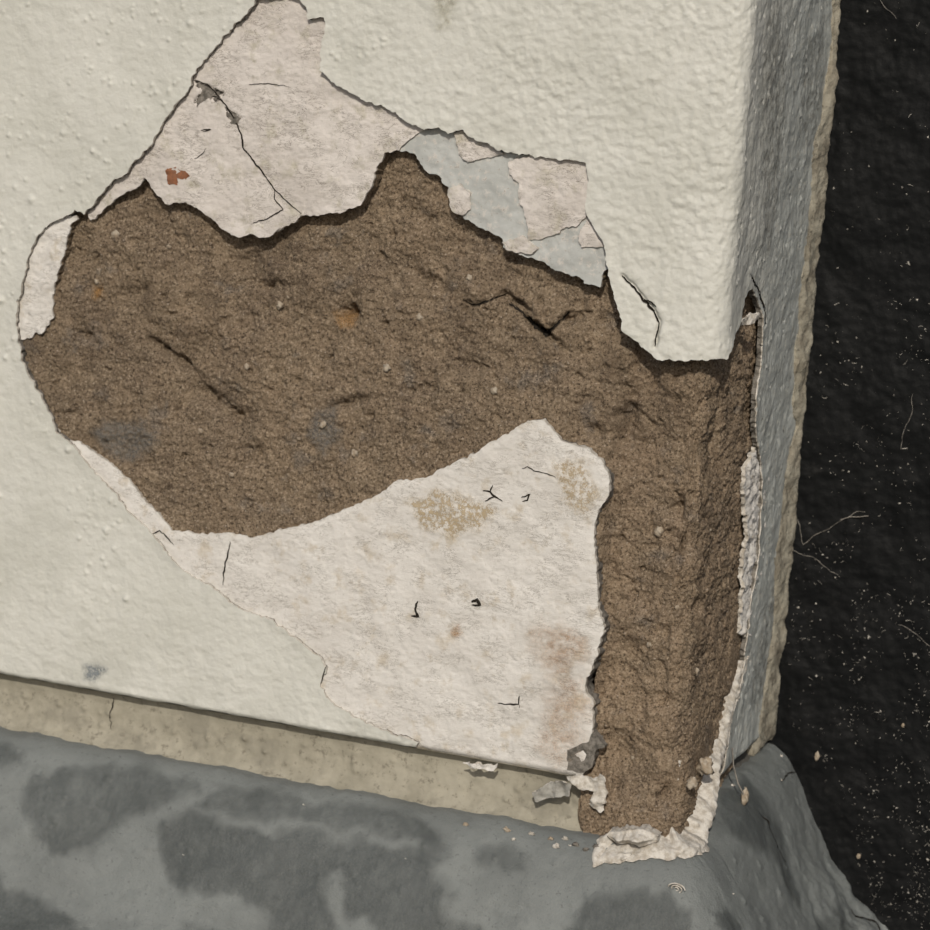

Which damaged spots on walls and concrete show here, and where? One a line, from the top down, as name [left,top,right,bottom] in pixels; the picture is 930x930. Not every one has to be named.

crack [195,80,301,223]
crack [462,293,570,337]
crack [622,276,660,346]
spalling [18,0,769,867]
water stain [163,815,442,930]
water stain [722,780,799,902]